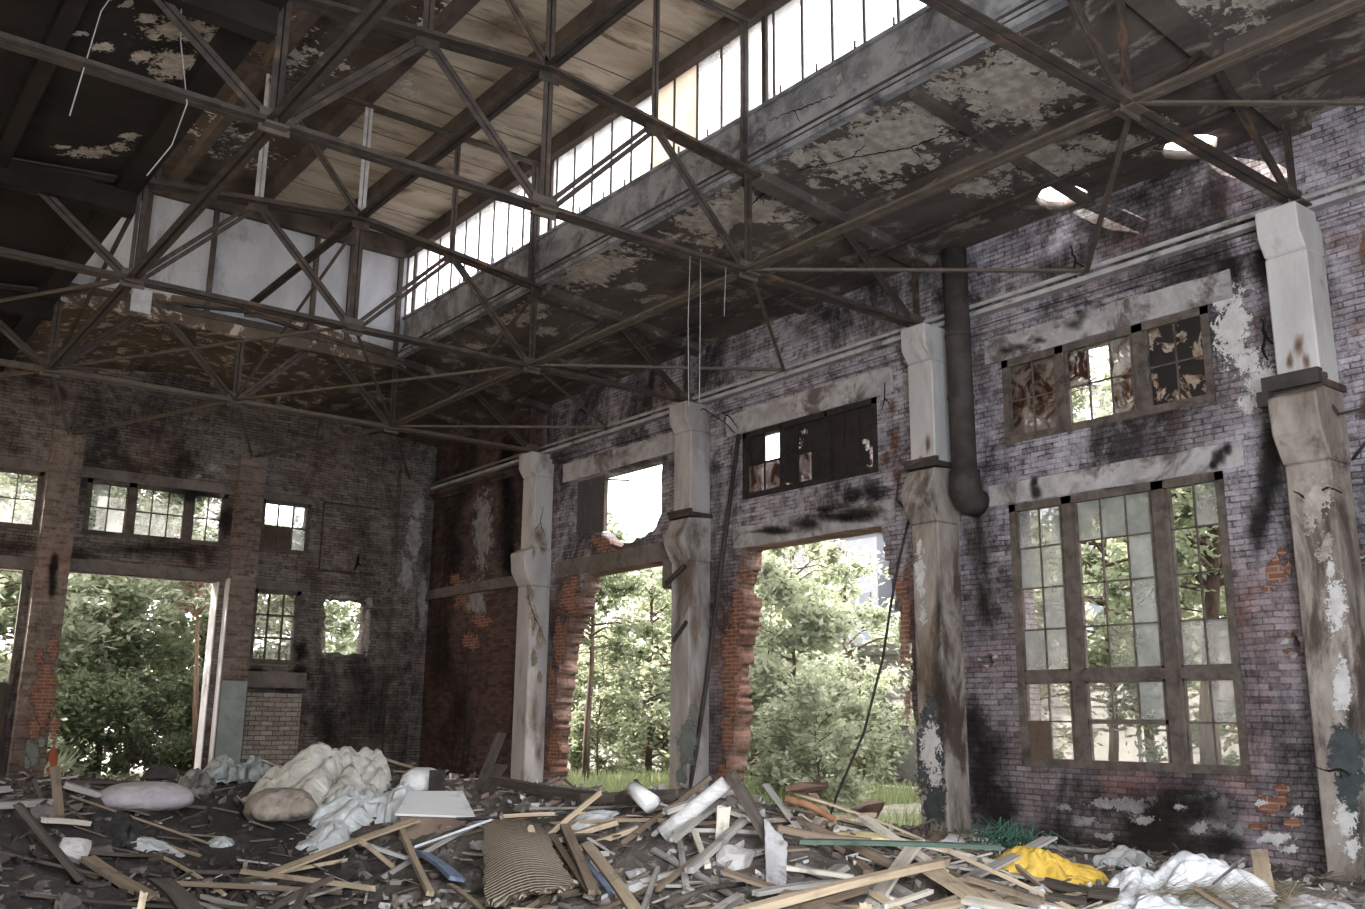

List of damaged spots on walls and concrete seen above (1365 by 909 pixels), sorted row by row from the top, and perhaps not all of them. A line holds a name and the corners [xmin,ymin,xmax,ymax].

peeling [72,0,220,82]
peeling [51,132,143,159]
peeling [758,37,1087,200]
peeling [950,127,1170,199]
peeling [658,178,810,256]
peeling [1210,272,1275,416]
water stain [1264,423,1279,475]
water stain [843,489,862,503]
water stain [1249,507,1267,551]
peeling [895,538,947,829]
peeling [1301,465,1365,863]
water stain [1352,804,1365,845]